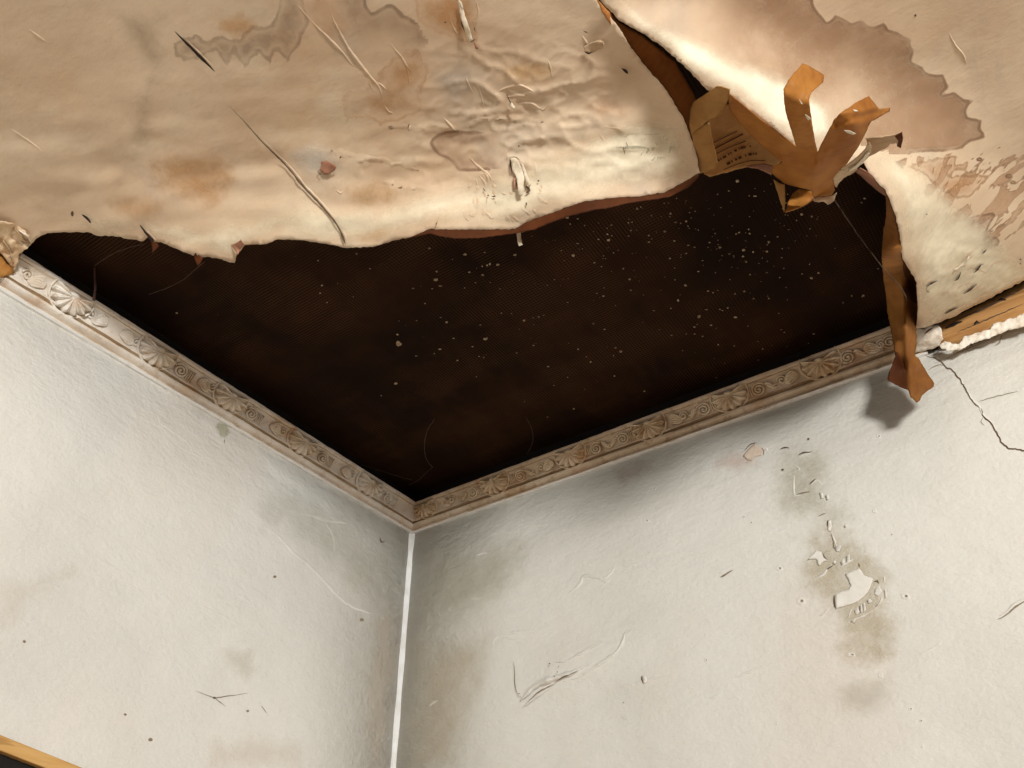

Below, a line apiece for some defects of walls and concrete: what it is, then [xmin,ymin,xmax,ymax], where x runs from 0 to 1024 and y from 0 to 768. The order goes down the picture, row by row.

peeling [444,0,480,49]
peeling [582,31,605,65]
peeling [498,84,548,111]
leakage [754,0,1024,247]
peeling [317,161,336,175]
peeling [506,145,539,206]
peeling [953,249,987,294]
flaking render [915,307,1024,353]
crack [926,335,1024,451]
spalling [781,438,887,626]